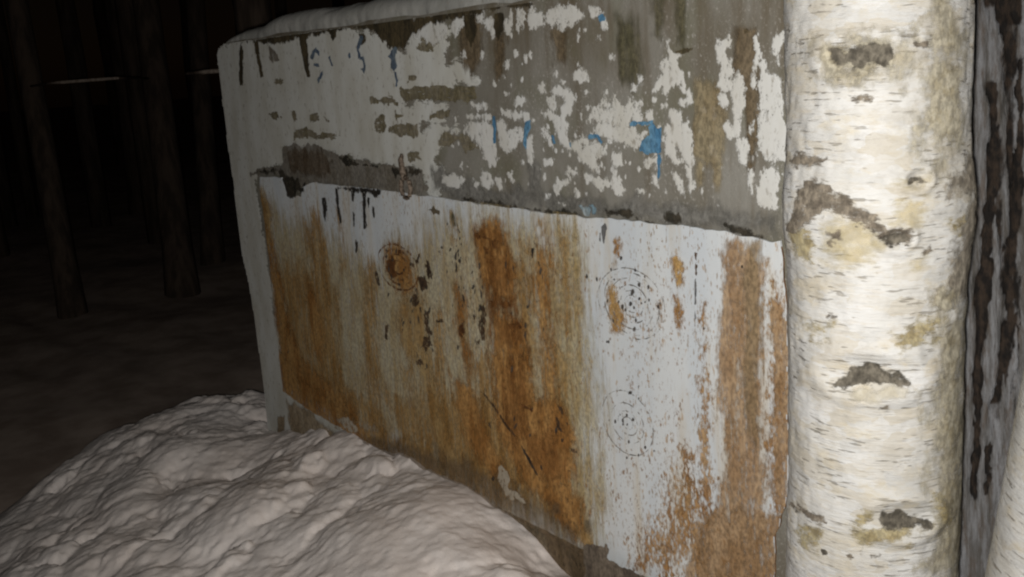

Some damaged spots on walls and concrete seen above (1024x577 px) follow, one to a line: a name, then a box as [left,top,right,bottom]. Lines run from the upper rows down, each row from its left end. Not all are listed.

peeling [217,2,704,433]
corrosion [261,188,788,577]
peeling [715,30,786,210]